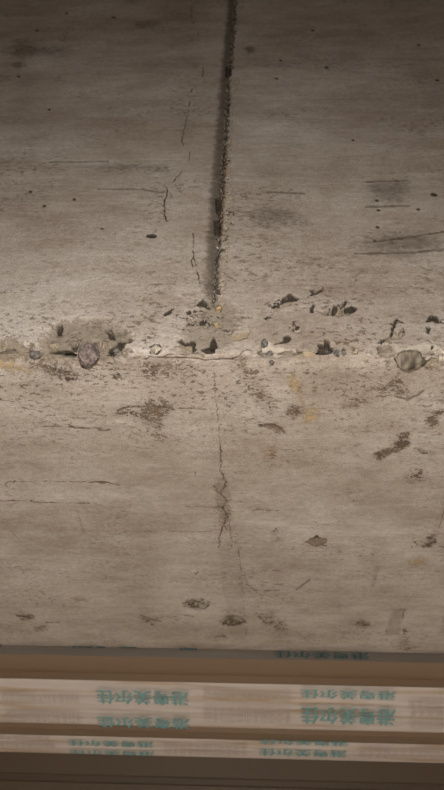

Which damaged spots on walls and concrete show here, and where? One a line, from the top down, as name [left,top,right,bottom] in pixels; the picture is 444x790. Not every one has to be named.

spalling [264,294,299,320]
spalling [310,289,357,317]
spalling [0,323,206,382]
crack [144,349,252,386]
spalling [258,321,359,365]
spalling [379,319,405,345]
flaking render [343,350,444,409]
peeling [117,400,172,438]
peeling [375,432,427,460]
crack [214,405,232,548]
spalling [305,535,327,547]